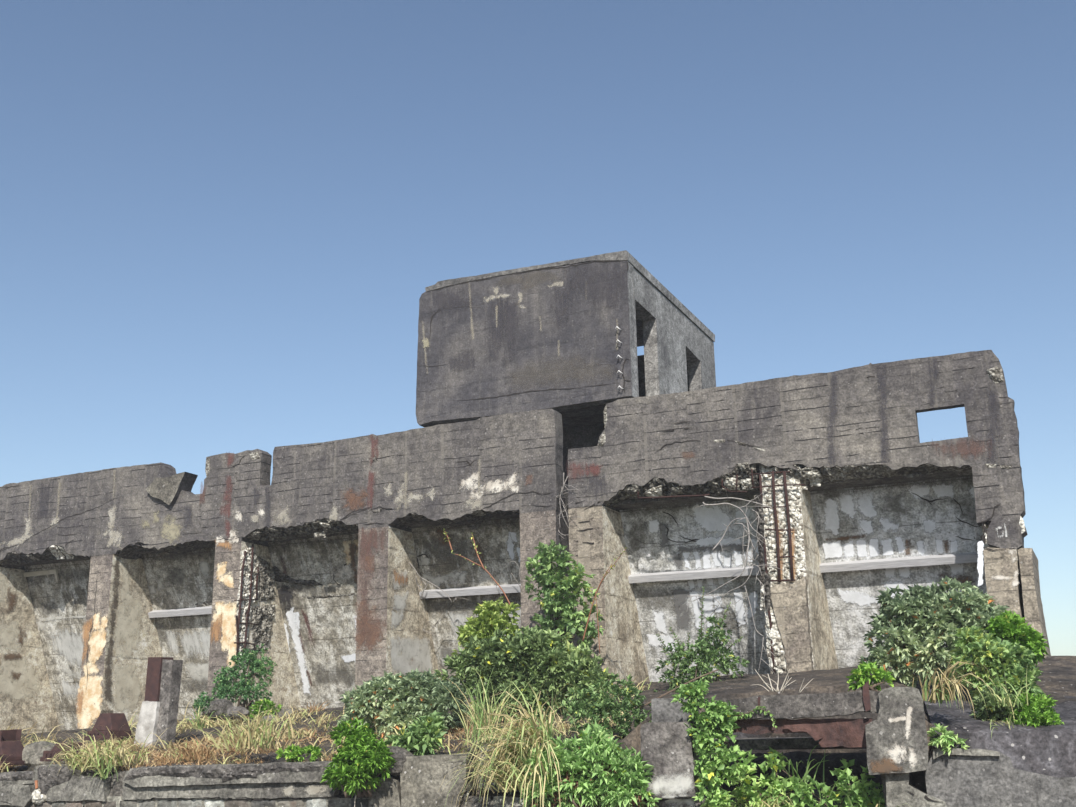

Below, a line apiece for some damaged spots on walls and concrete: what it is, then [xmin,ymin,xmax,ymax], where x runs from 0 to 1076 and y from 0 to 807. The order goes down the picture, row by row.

leakage [4,627,26,680]
leakage [31,599,86,696]
peeling [77,558,143,729]
corrosion [211,614,222,641]
corrosion [217,453,234,548]
spalling [195,544,357,668]
leakage [638,589,691,630]
peeling [646,610,683,658]
leakage [624,501,748,569]
spalling [683,462,823,674]
peeling [823,487,964,606]
crack [911,492,1015,570]